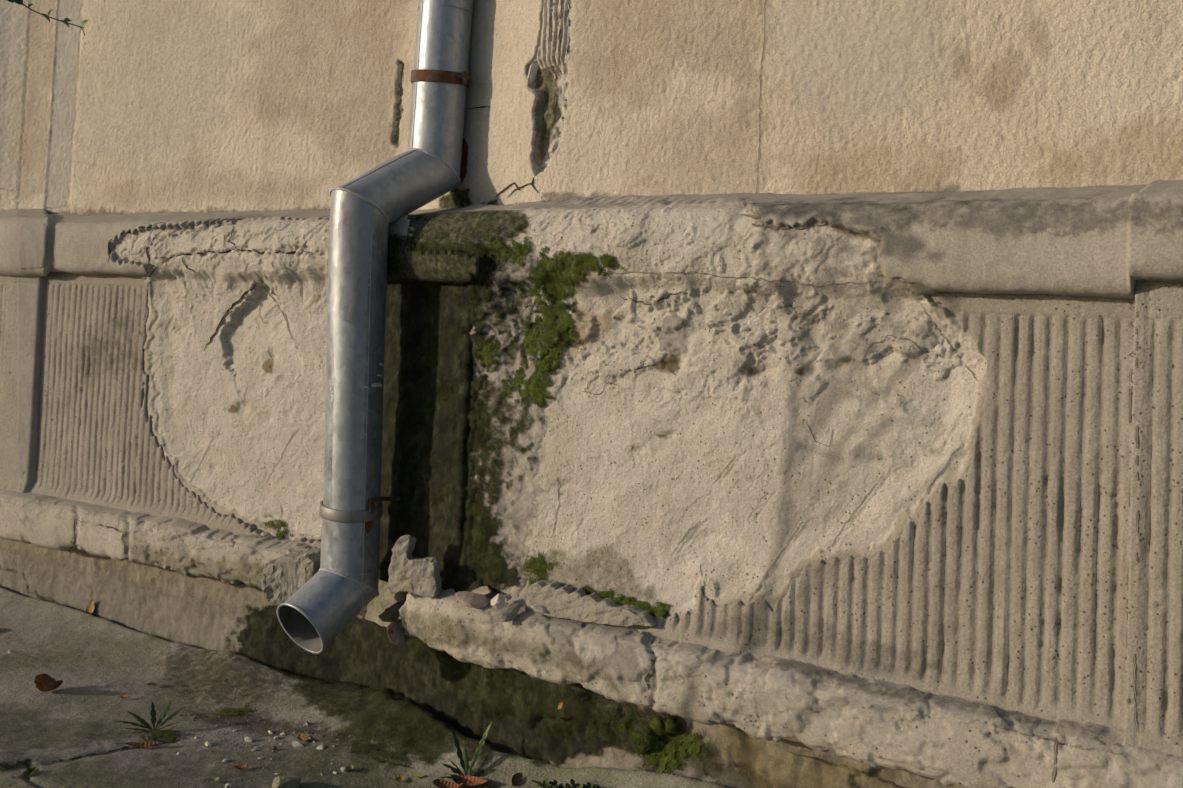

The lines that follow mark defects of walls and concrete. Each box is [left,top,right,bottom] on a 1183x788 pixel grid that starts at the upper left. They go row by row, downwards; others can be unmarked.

flaking render [526,0,571,174]
crack [107,221,317,366]
flaking render [110,219,330,541]
flaking render [456,195,988,667]
crack [41,740,177,788]
water stain [226,604,607,770]
water stain [554,630,646,681]
peeling [634,641,1002,762]